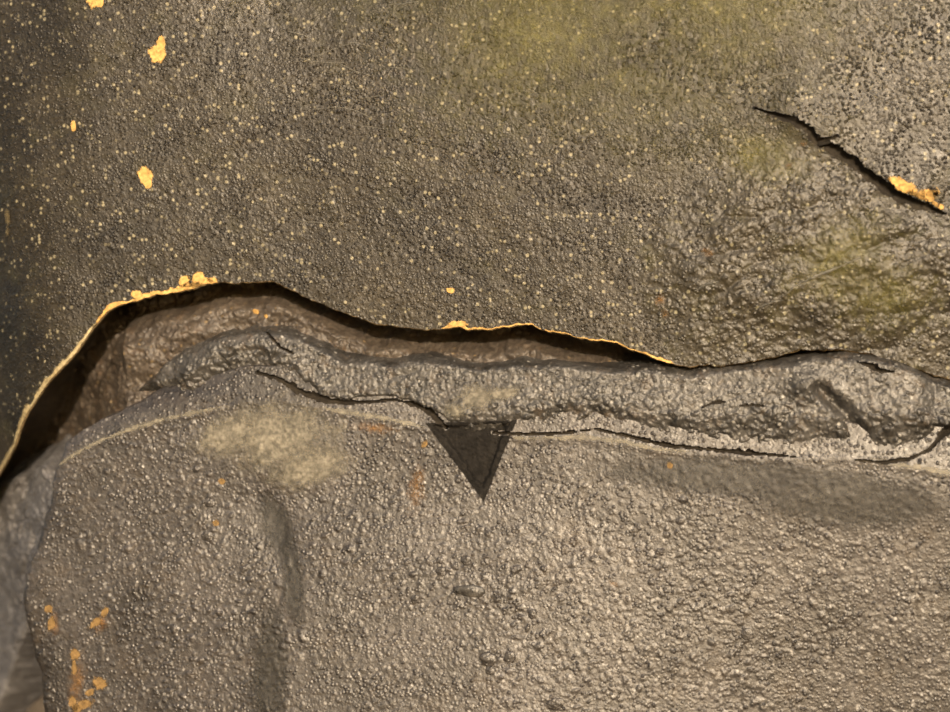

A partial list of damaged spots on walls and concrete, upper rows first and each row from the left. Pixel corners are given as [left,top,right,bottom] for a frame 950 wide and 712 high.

crack [754,106,947,215]
spalling [0,272,874,487]
crack [857,361,894,373]
crack [257,370,448,429]
crack [702,400,762,408]
spalling [421,420,517,501]
crack [493,428,795,458]
crack [854,422,950,465]
peeling [44,605,55,630]
peeling [90,607,109,628]
peeling [70,648,80,675]
peeling [69,677,107,712]